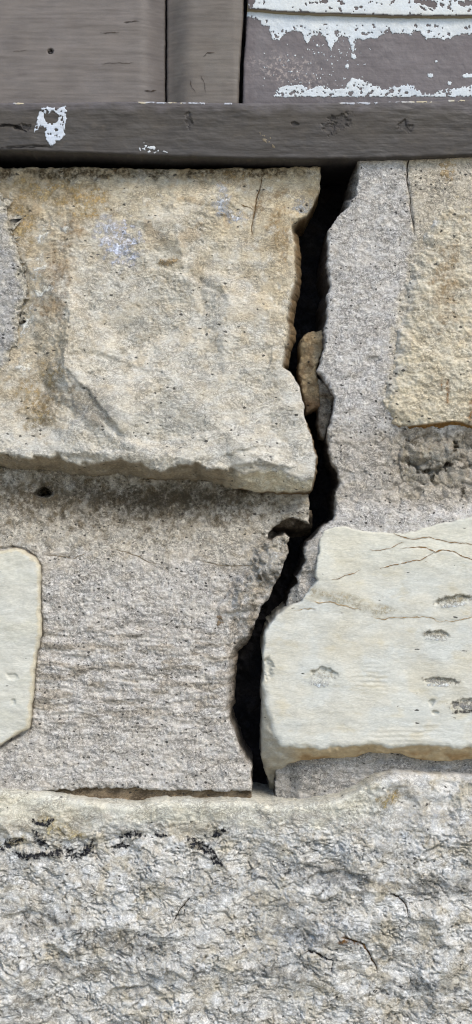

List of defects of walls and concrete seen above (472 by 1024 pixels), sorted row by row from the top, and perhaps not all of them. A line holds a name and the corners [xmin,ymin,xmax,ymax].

peeling [247,0,472,105]
peeling [34,106,67,146]
crack [242,177,262,234]
crack [288,183,346,382]
crack [51,547,162,565]
crack [200,413,472,784]